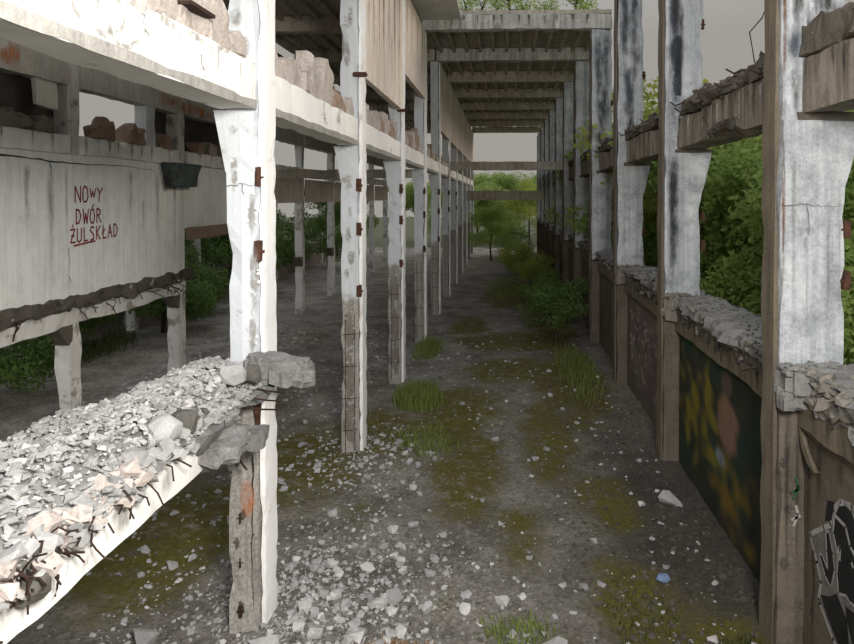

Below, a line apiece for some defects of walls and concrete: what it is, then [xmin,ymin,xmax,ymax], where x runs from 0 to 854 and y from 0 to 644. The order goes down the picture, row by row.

damp [622,0,638,43]
damp [625,56,637,126]
damp [670,0,683,101]
spalling [670,13,764,113]
damp [670,164,678,259]
spalling [677,294,763,379]
spalling [802,365,854,446]
spalling [0,388,285,615]